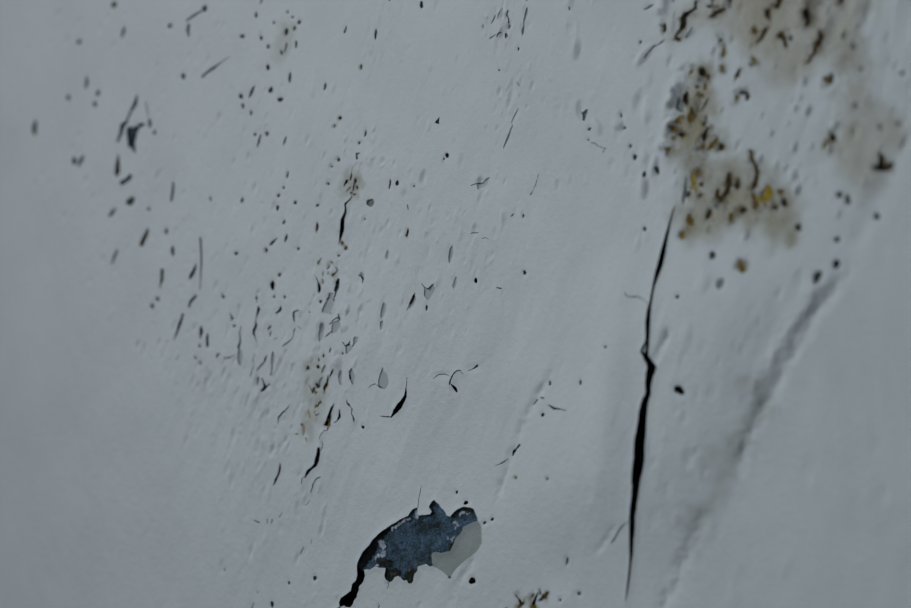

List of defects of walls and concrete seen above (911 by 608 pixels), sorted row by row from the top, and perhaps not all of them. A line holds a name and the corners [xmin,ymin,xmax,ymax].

leakage [663,0,793,48]
leakage [802,8,824,64]
peeling [117,95,156,153]
leakage [665,67,725,160]
peeling [115,154,132,185]
leakage [679,170,704,239]
leakage [705,149,788,224]
leakage [873,151,894,172]
peeling [173,237,202,340]
peeling [216,313,275,386]
crack [610,206,675,601]
peeling [338,488,482,608]